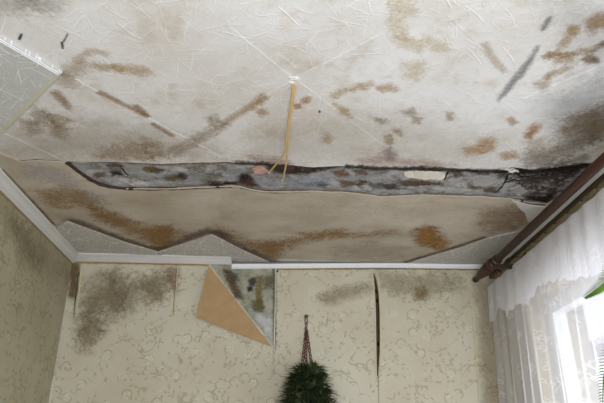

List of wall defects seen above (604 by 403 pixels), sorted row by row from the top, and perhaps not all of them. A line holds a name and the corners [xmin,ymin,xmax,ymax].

peeling [0,153,591,262]
flaking render [210,264,276,349]